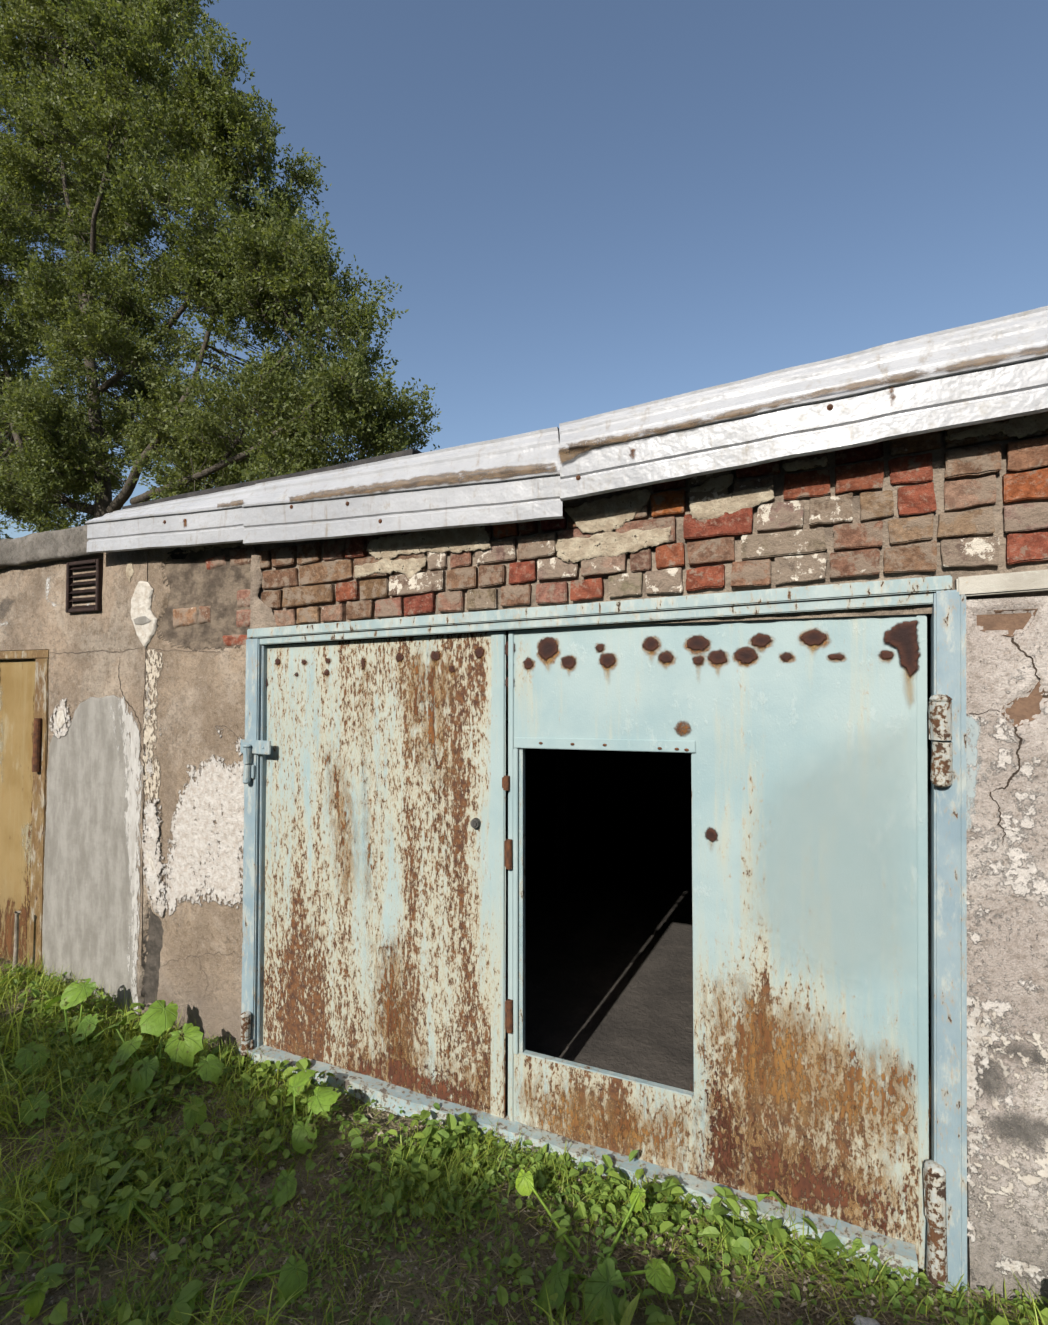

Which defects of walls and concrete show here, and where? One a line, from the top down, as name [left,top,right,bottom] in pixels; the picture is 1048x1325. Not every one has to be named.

flaking render [354,526,491,579]
flaking render [555,489,671,563]
flaking render [689,484,775,520]
rust [642,633,795,667]
rust [799,629,845,661]
rust [880,620,921,683]
crack [1011,638,1048,698]
peeling [134,546,254,1007]
crack [969,710,1023,843]
leakage [976,1046,1048,1094]
rust [523,981,931,1240]
leakage [990,1113,1048,1149]